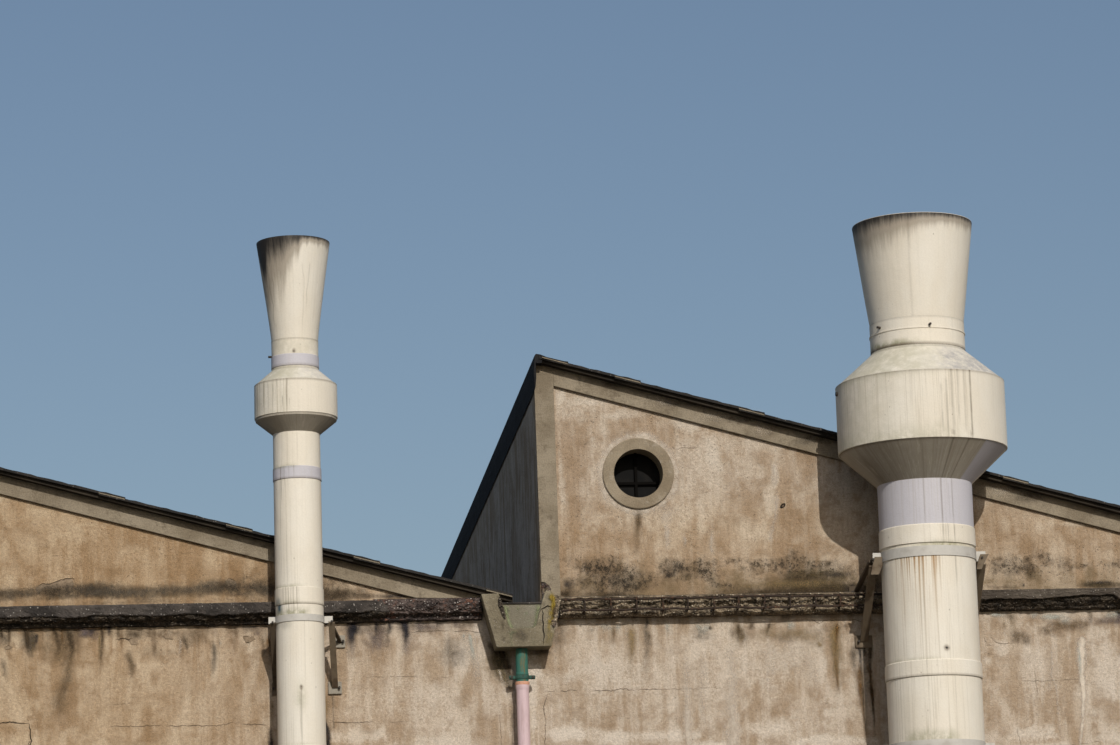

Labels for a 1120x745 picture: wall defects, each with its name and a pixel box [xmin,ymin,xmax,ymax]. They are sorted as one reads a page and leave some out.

water stain [112,588,166,597]
water stain [349,623,357,641]
water stain [372,622,408,643]